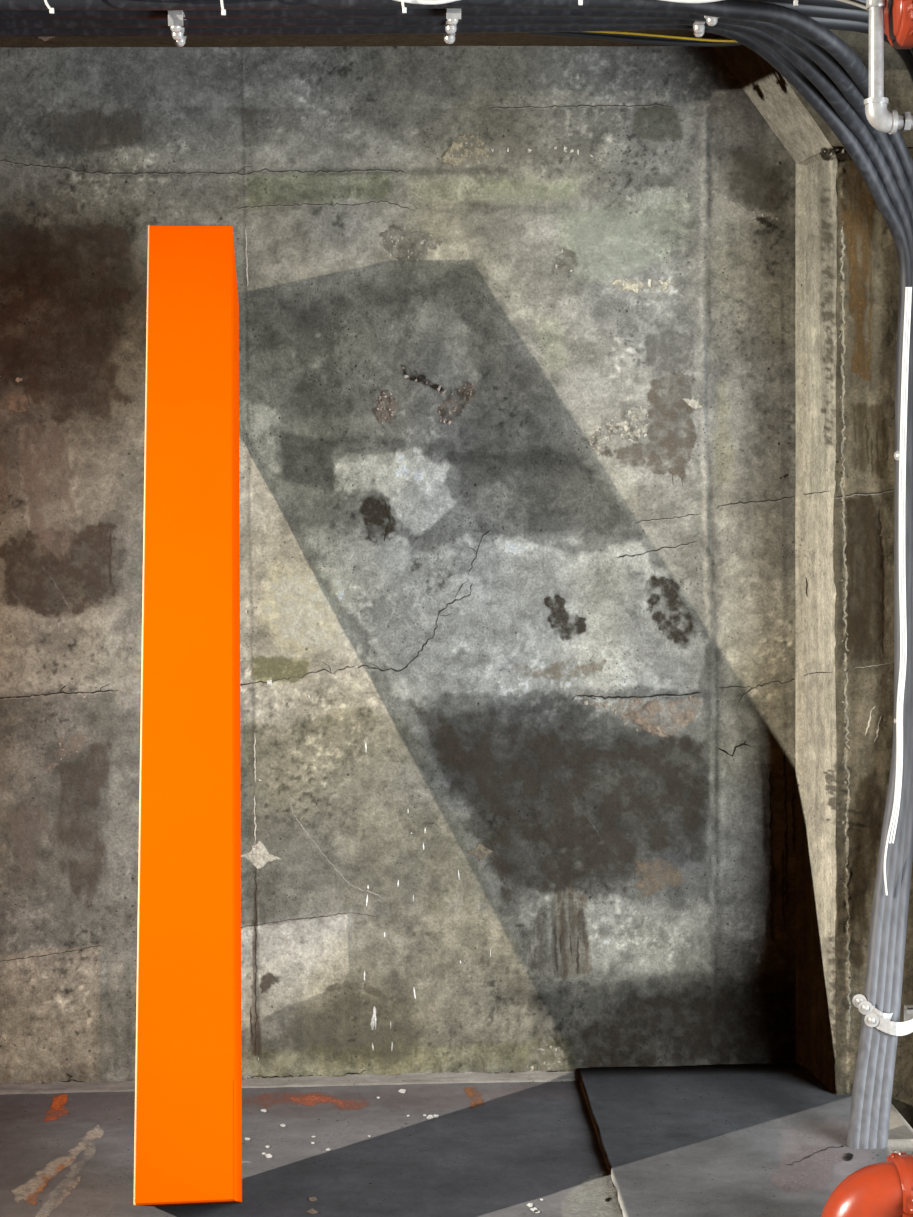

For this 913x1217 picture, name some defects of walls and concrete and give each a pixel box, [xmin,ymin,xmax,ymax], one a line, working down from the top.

spalling [587,405,650,457]
damp [0,413,116,616]
damp [360,497,395,542]
crack [618,489,892,558]
crack [240,530,491,686]
damp [544,595,586,640]
damp [648,576,693,644]
crack [0,684,118,699]